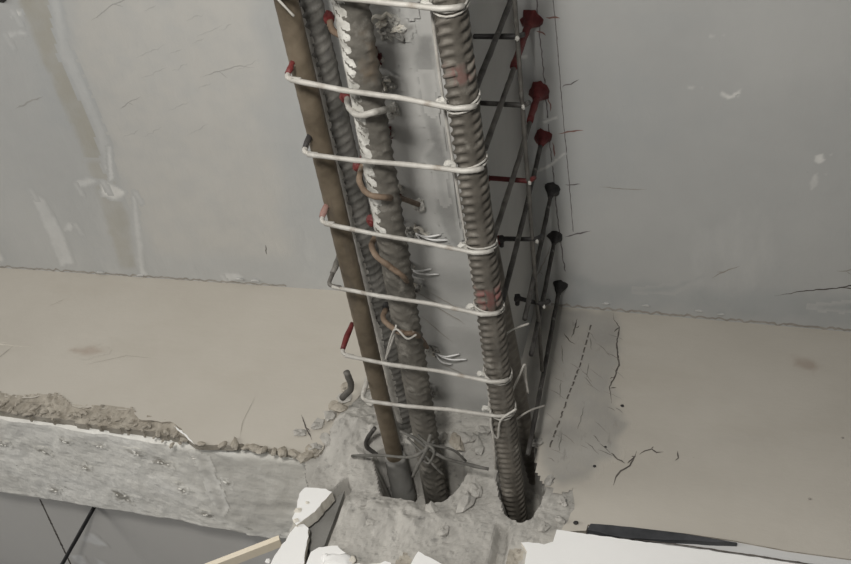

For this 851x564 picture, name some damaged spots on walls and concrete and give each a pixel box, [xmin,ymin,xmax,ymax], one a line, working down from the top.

water stain [15,0,138,271]
spalling [218,0,636,564]
crack [777,269,851,296]
spalling [0,391,206,449]
crack [612,447,679,485]
spalling [110,489,135,506]